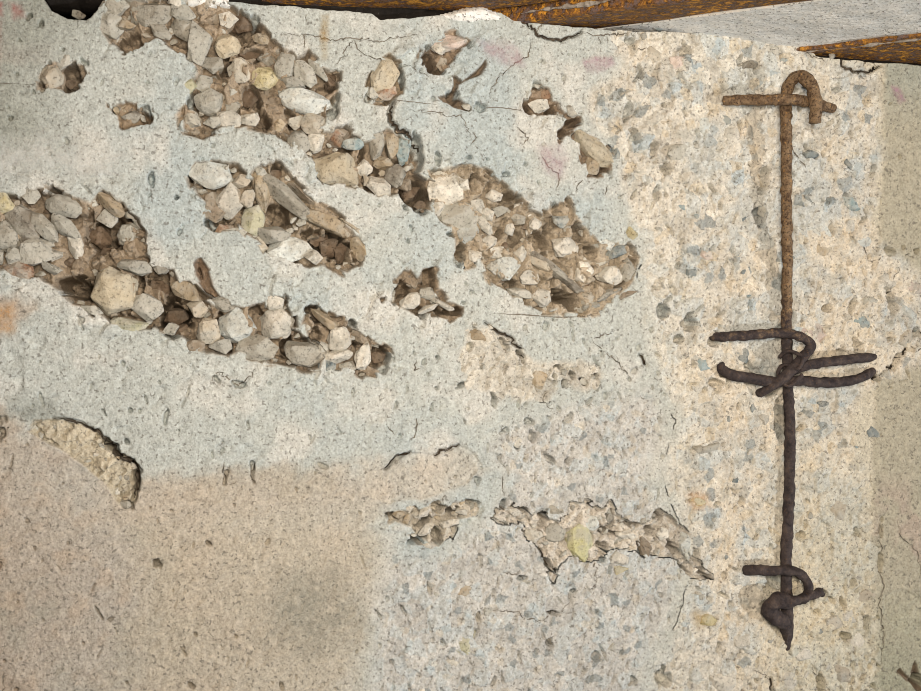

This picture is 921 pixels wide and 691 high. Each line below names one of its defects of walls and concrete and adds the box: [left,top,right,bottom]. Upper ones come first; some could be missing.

spalling [99,0,640,319]
spalling [0,184,386,377]
spalling [378,266,608,405]
spalling [571,28,921,691]
peeling [27,418,141,509]
flaking render [361,445,482,504]